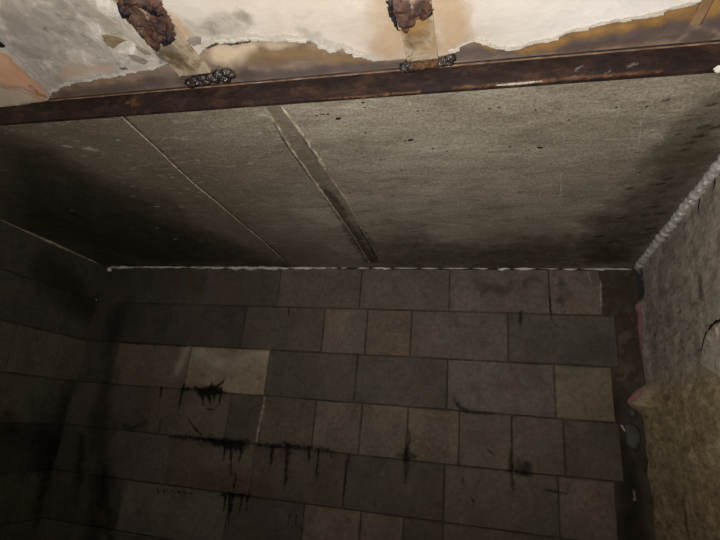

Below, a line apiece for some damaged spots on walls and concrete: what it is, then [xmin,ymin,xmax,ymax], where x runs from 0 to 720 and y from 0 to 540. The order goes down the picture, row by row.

peeling [0,0,168,107]
peeling [141,5,175,47]
flaking render [187,35,376,61]
corrosion [244,48,387,79]
peeling [386,0,400,31]
corrosion [378,20,427,55]
flaking render [448,2,696,54]
leakage [179,380,225,410]
leakage [170,420,247,466]